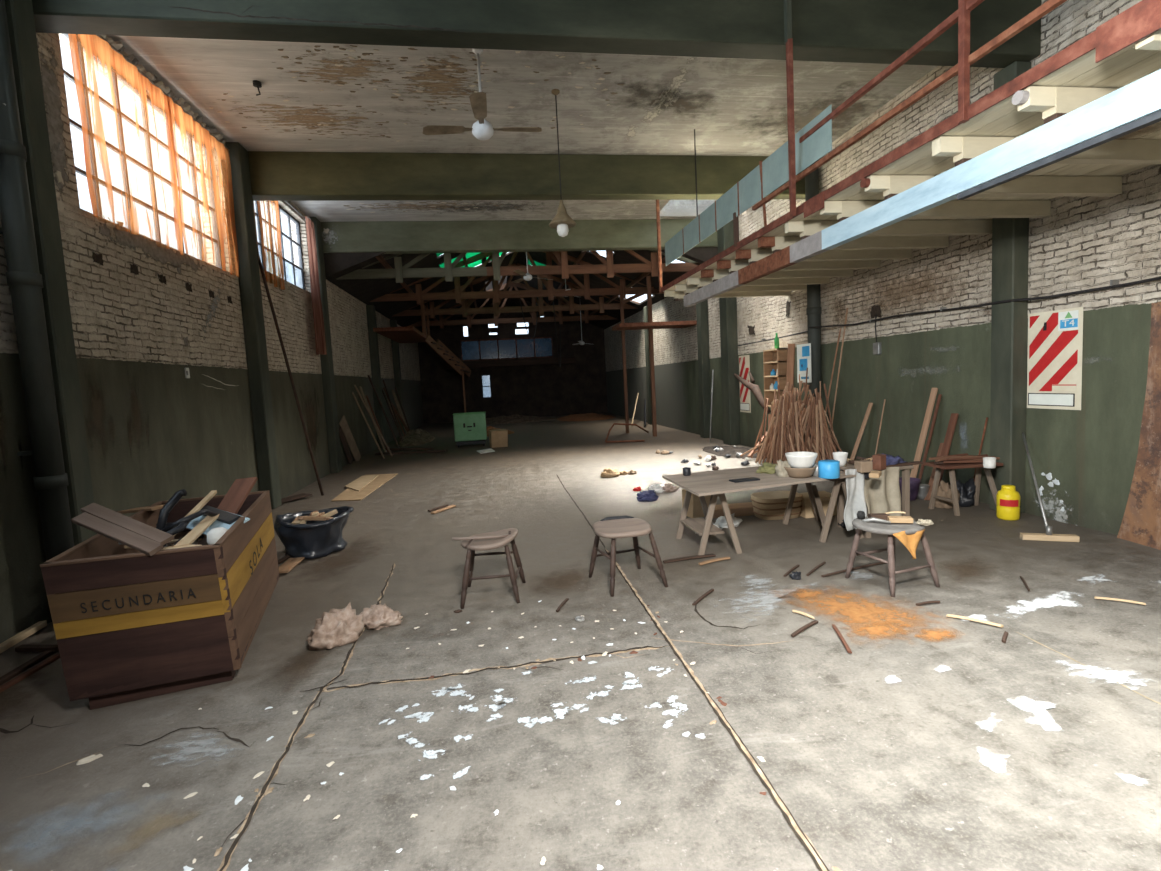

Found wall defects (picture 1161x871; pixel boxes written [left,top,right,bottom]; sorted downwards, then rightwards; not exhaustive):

peeling [96,35,497,143]
damp [626,58,713,141]
damp [744,83,868,136]
crack [214,475,842,871]
crack [0,715,72,734]
crack [19,726,249,779]